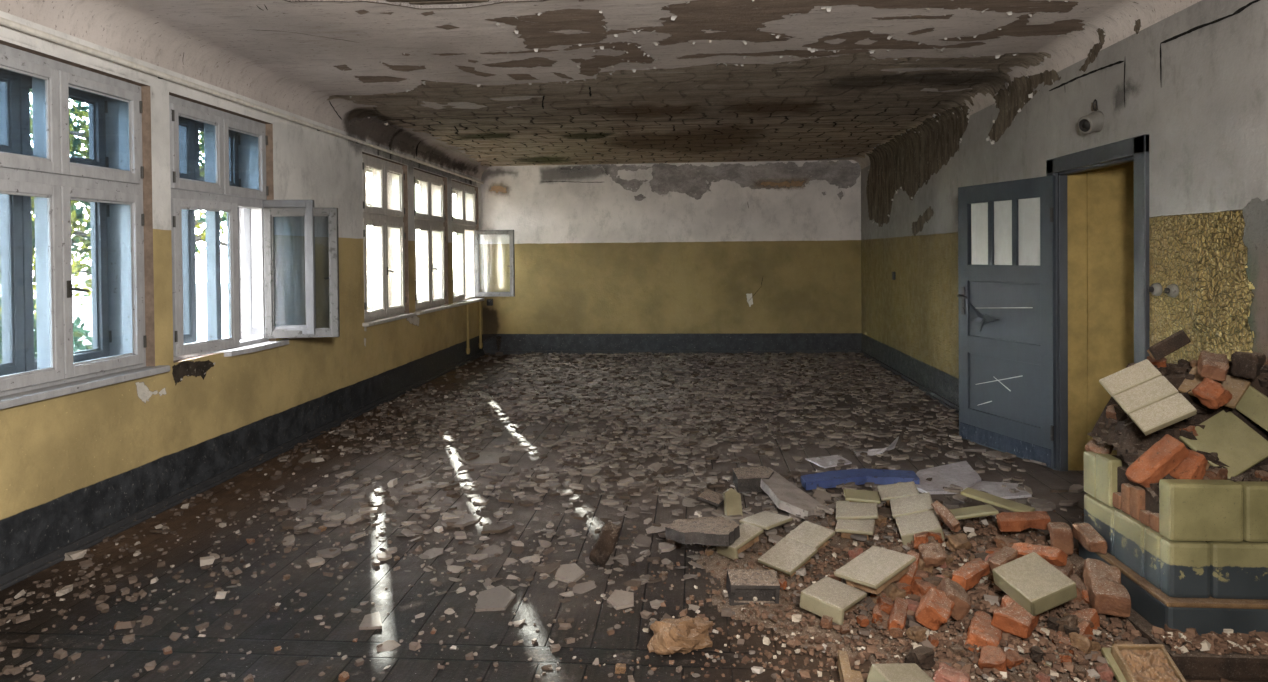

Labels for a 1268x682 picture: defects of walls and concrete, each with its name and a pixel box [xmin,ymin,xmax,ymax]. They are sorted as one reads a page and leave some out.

peeling [284,0,1106,227]
peeling [911,206,934,236]
peeling [1242,198,1268,365]
peeling [135,359,215,403]